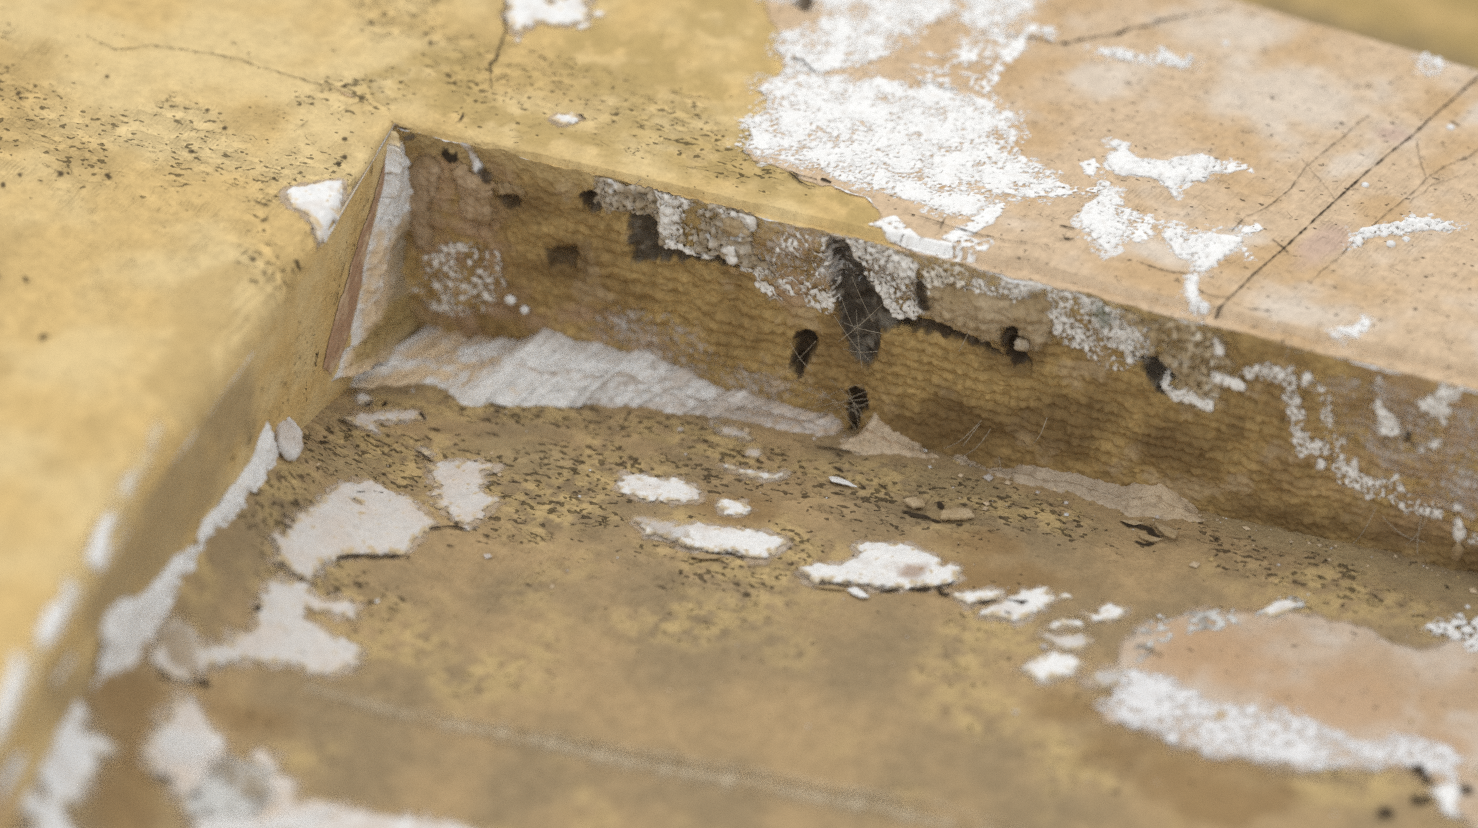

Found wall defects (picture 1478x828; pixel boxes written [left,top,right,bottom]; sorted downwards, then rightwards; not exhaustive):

peeling [501,0,607,43]
peeling [548,112,586,127]
flaking render [253,124,1207,546]
peeling [746,0,1478,404]
crack [1141,76,1478,319]
peeling [0,418,505,828]
peeling [613,470,793,565]
peeling [795,540,1478,828]